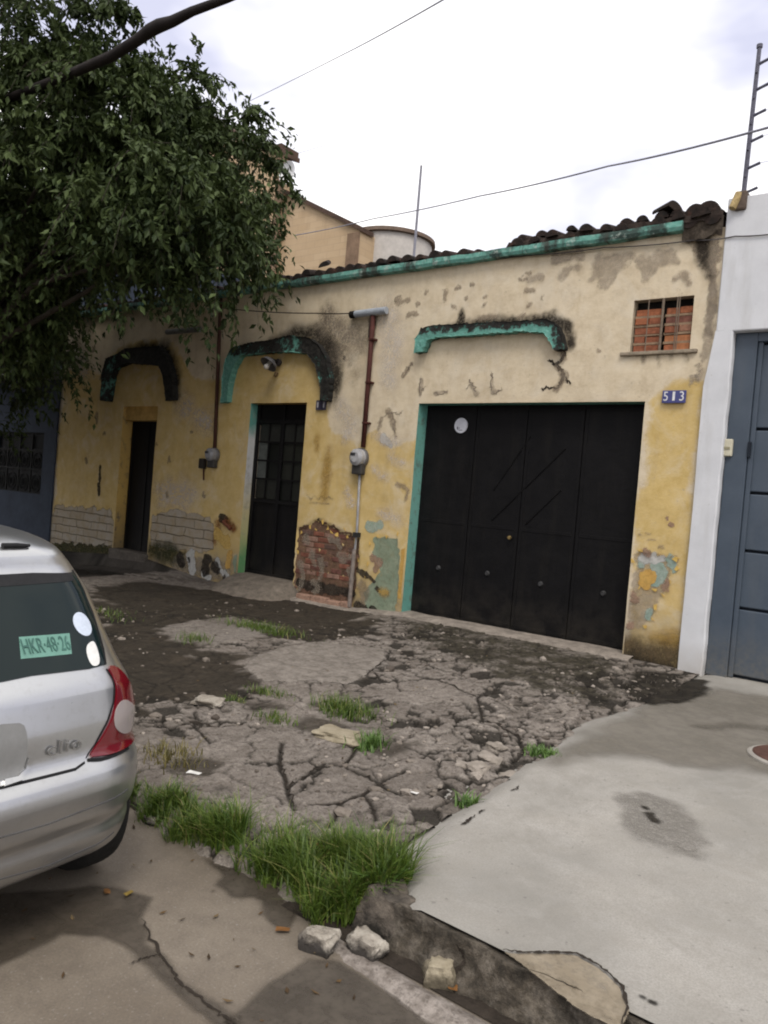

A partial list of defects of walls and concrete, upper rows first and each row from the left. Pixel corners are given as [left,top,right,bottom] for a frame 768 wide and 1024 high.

water stain [273,316,368,398]
crack [541,350,571,392]
flaking render [176,513,237,580]
flaking render [293,513,405,611]
peeling [626,539,679,629]
crack [147,721,233,740]
crack [441,681,524,791]
crack [267,743,404,827]
crack [128,918,233,1024]